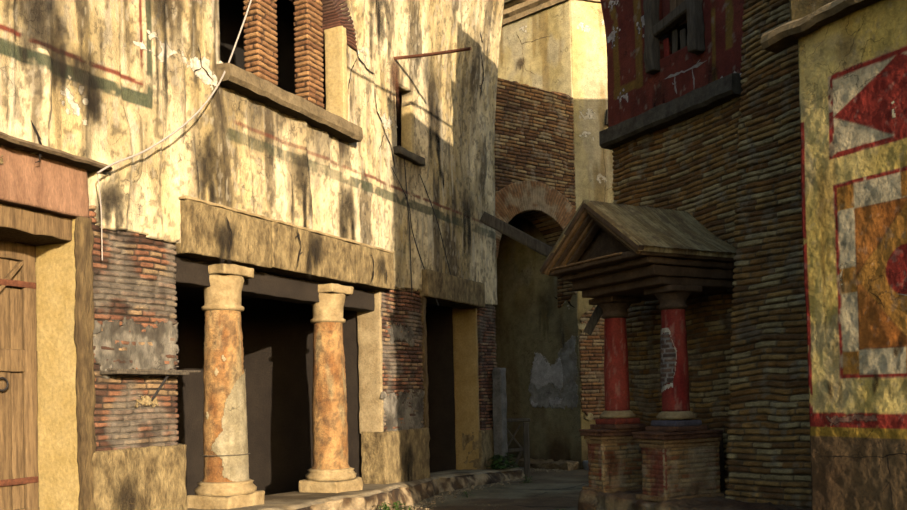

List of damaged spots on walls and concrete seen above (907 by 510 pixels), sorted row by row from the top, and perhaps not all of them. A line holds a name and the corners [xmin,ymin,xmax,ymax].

leakage [22,0,101,120]
leakage [154,0,165,26]
peeling [601,19,621,48]
leakage [98,185,122,231]
leakage [197,140,217,202]
leakage [292,157,313,227]
leakage [341,192,354,240]
flaking render [528,305,605,421]
flaking render [660,328,677,392]